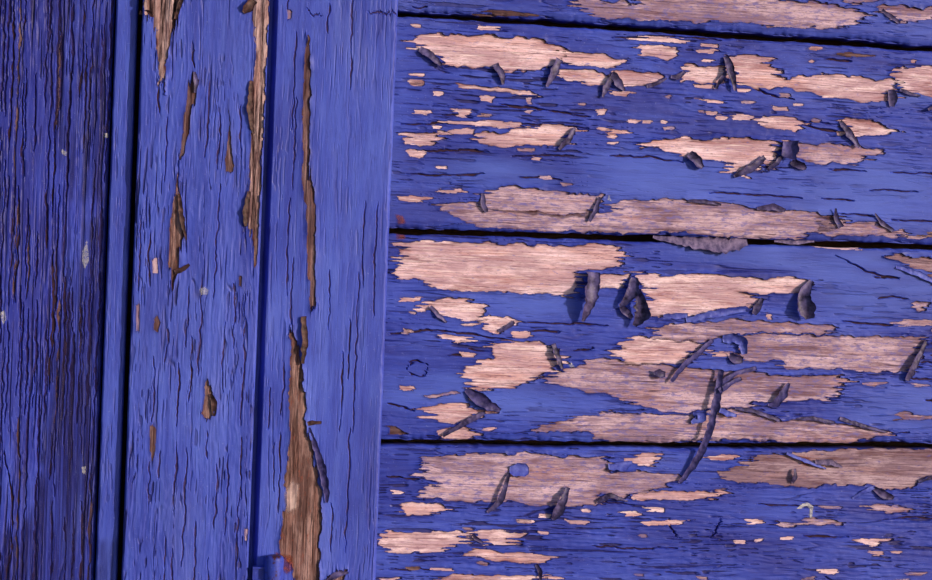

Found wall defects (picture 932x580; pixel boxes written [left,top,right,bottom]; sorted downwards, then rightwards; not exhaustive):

peeling [140,0,184,92]
peeling [242,0,269,268]
peeling [398,10,932,179]
peeling [279,35,349,580]
peeling [377,176,932,580]